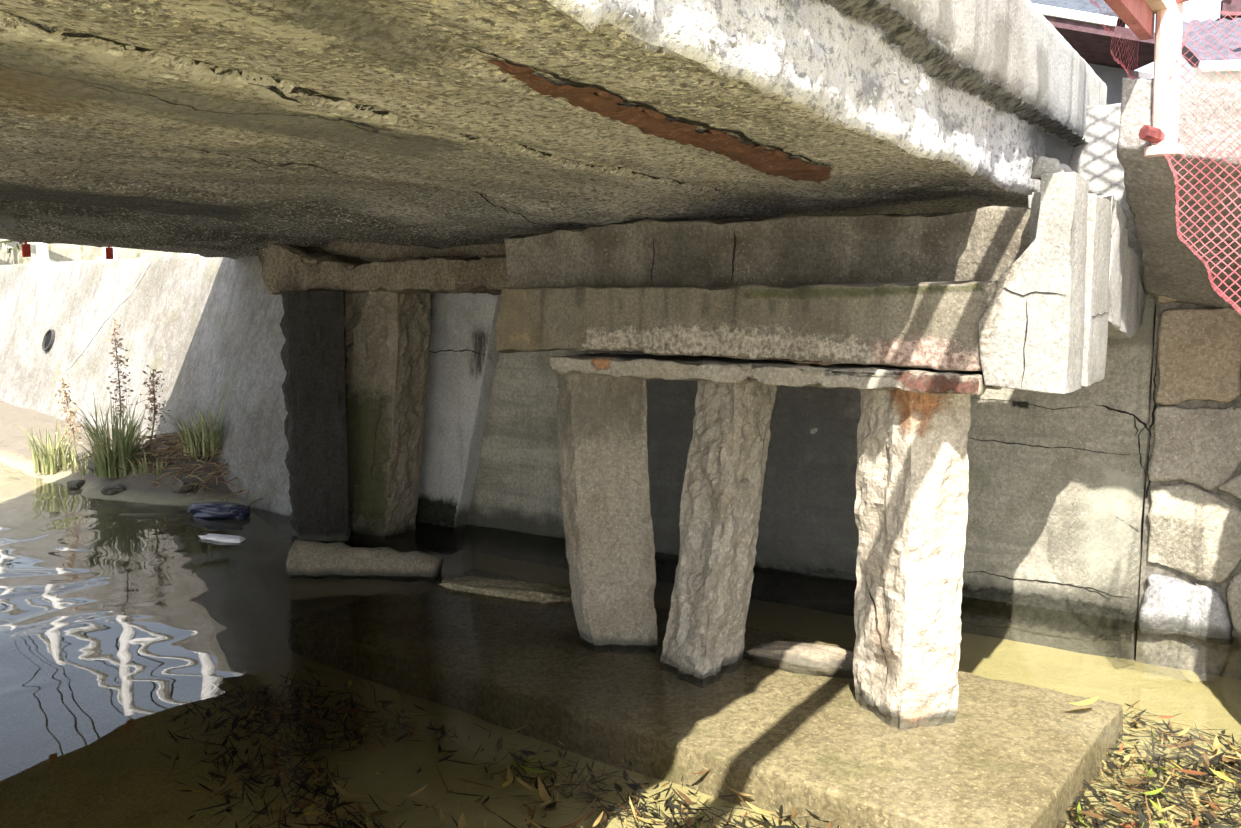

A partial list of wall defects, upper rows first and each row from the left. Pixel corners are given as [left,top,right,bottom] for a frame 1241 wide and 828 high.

crack [0,13,480,146]
rust [460,44,835,183]
spalling [856,70,884,102]
spalling [940,112,965,136]
crack [157,145,334,173]
crack [517,143,686,184]
rust [888,371,984,435]
crack [971,288,1159,498]
crack [863,576,888,683]